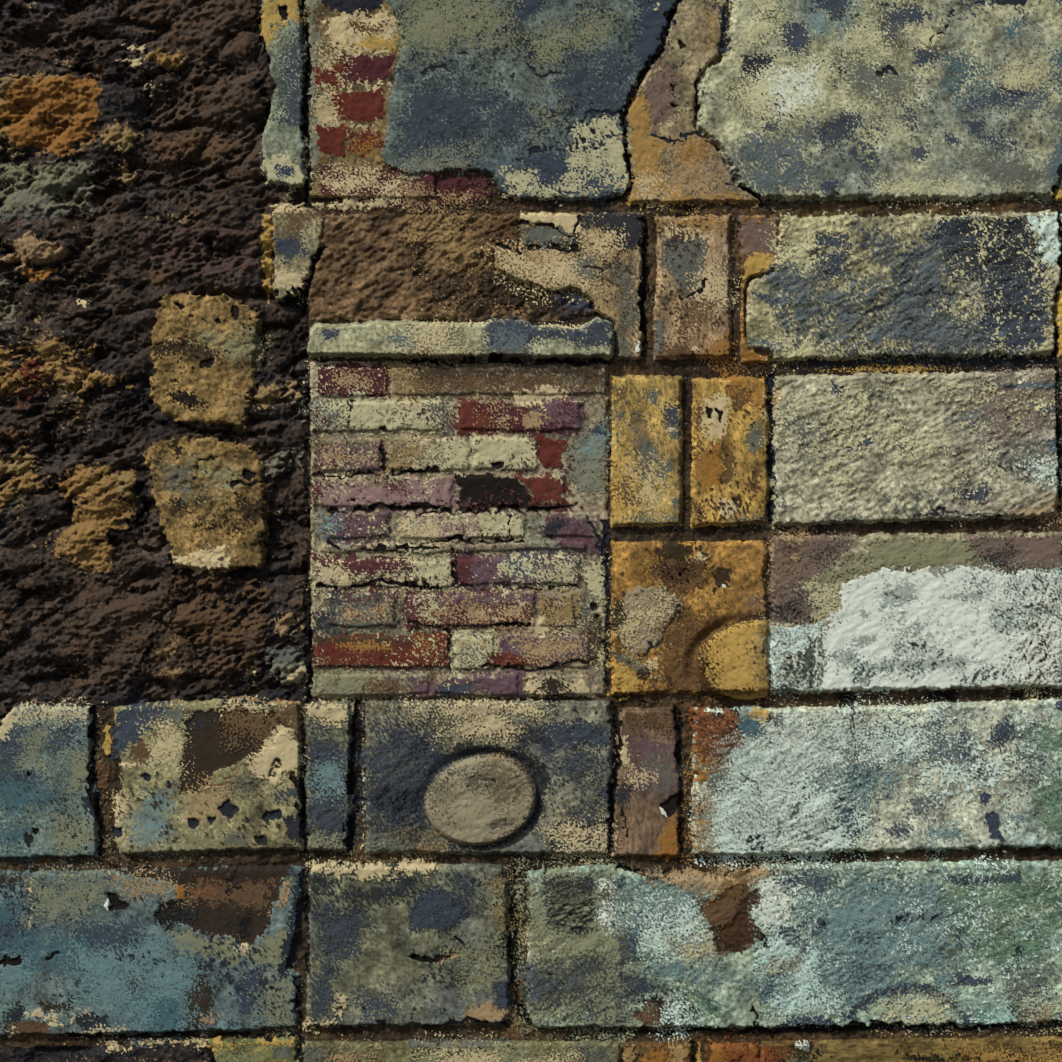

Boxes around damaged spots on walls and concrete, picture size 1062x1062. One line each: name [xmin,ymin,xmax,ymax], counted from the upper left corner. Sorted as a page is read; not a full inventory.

spalling [447,0,649,103]